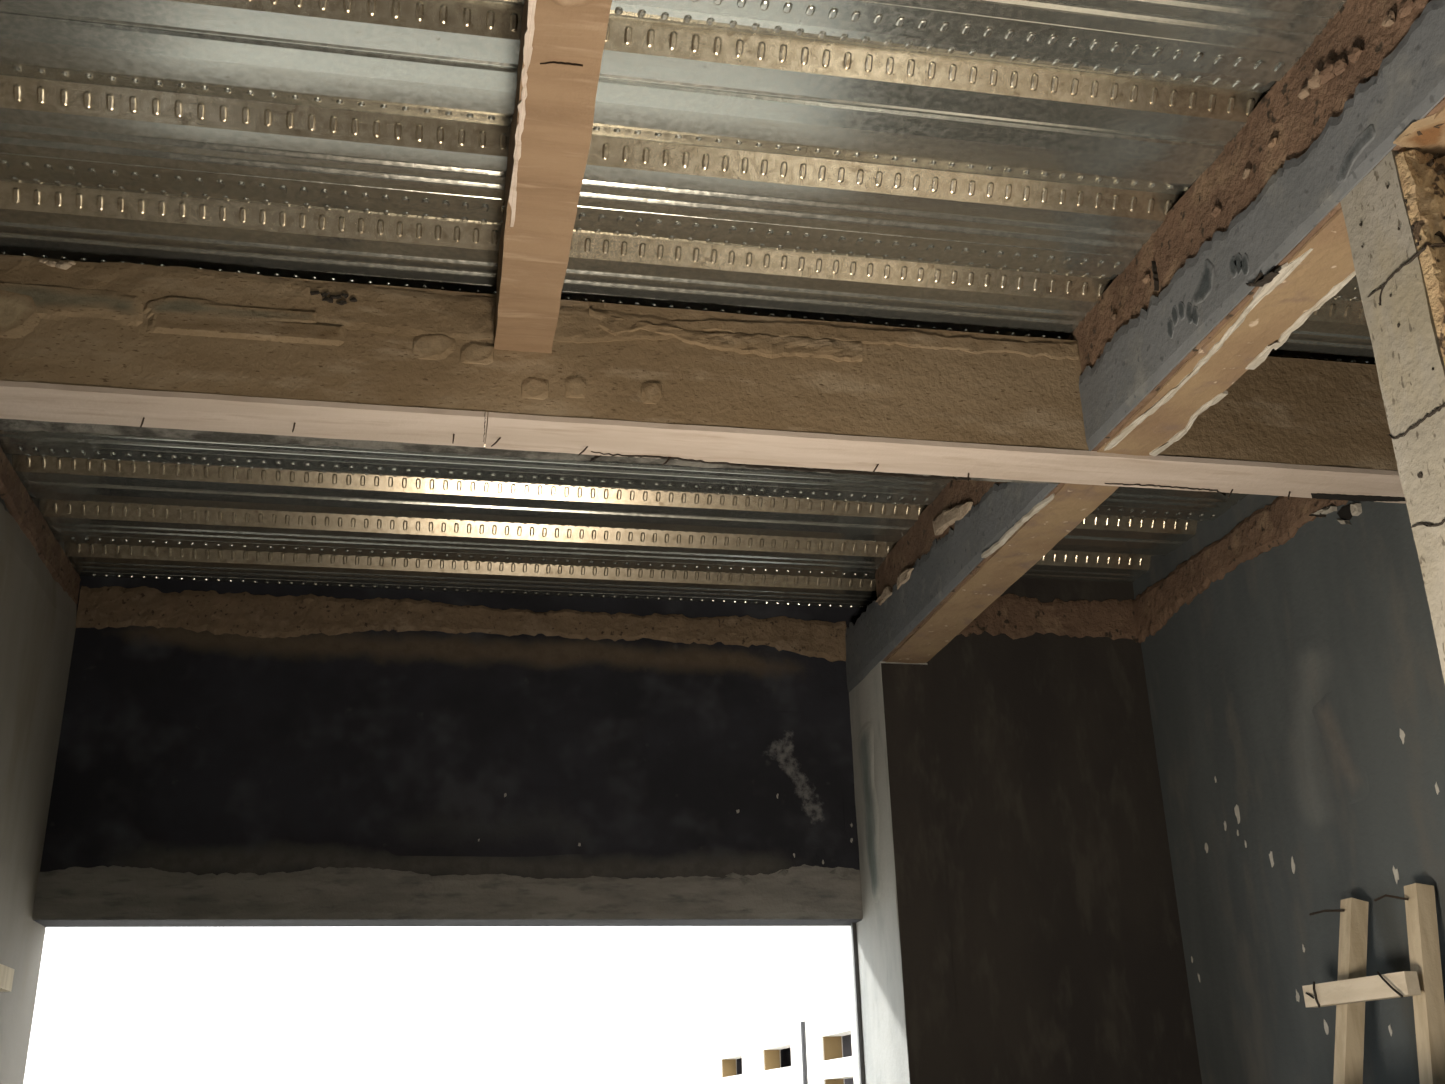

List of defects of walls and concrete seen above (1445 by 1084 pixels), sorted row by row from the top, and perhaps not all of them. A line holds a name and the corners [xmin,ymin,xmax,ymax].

spalling [1381,0,1430,27]
spalling [1297,46,1363,100]
crack [1368,231,1445,304]
flaking render [1104,248,1313,456]
flaking render [1245,271,1356,370]
crack [1388,403,1445,439]
flaking render [981,493,1055,558]
crack [1410,519,1445,528]